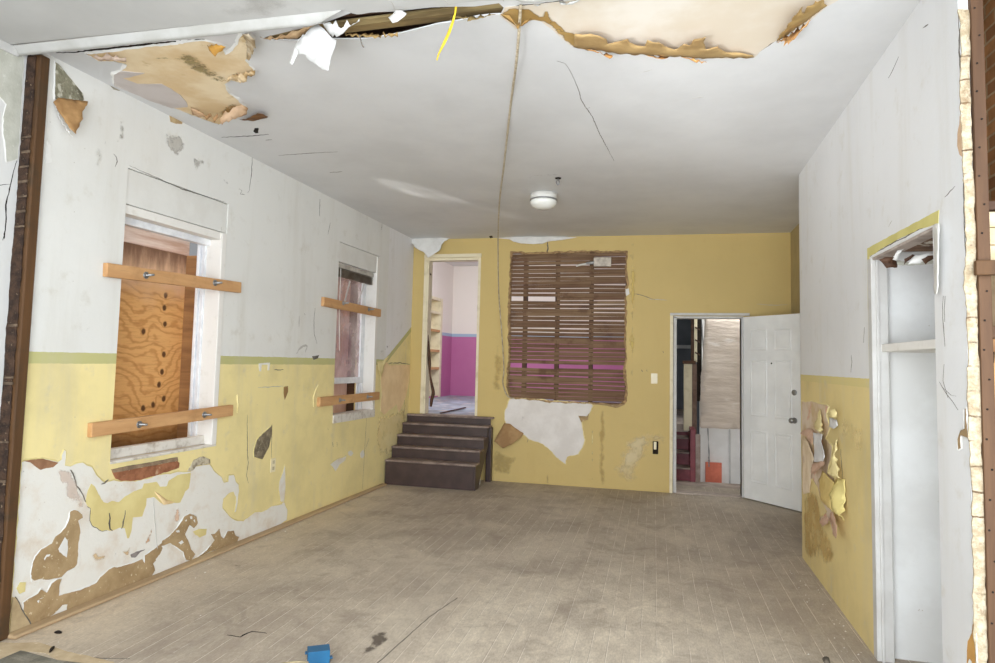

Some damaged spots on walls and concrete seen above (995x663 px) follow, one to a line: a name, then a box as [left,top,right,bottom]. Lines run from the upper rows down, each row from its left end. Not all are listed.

peeling [500,0,838,59]
flaking render [0,49,25,163]
flaking render [52,61,84,101]
peeling [84,32,268,125]
crack [558,61,611,155]
crack [3,161,17,239]
peeling [504,250,629,465]
flaking render [957,9,988,663]
flaking render [253,424,272,460]
peeling [800,400,846,538]
peeling [9,449,288,633]